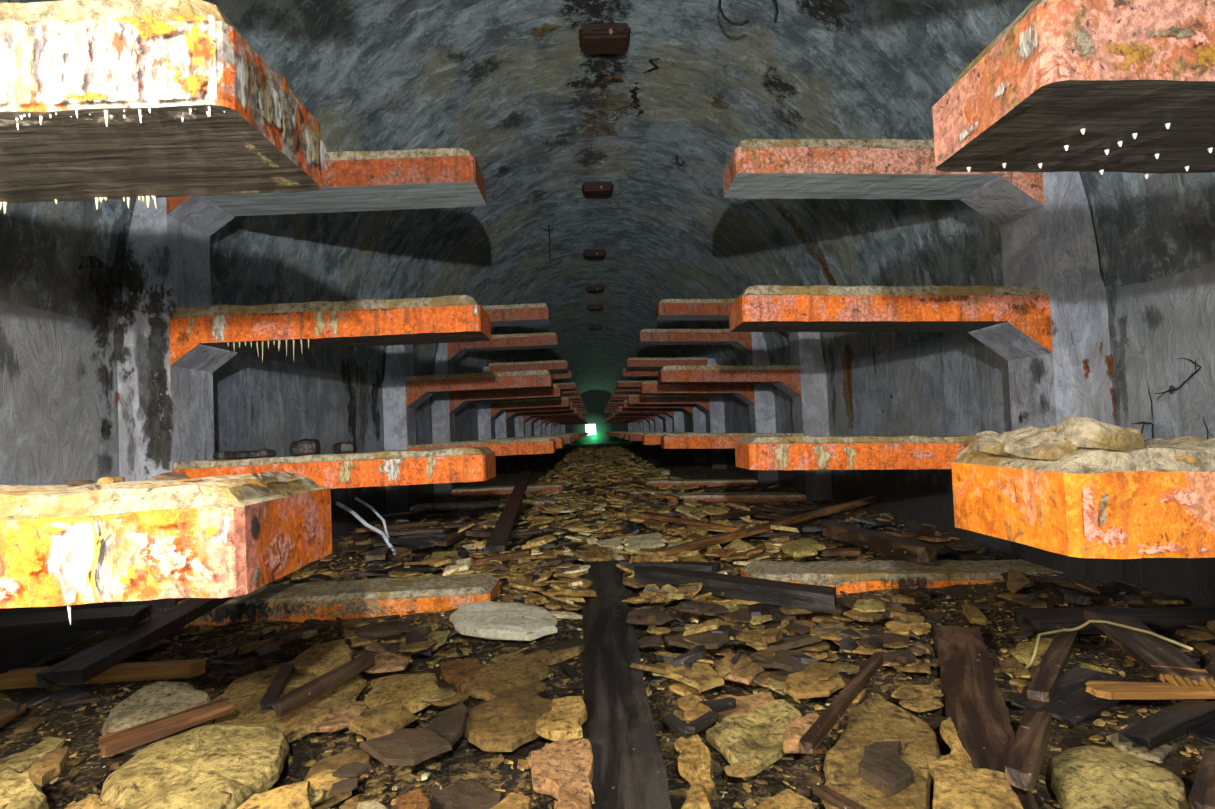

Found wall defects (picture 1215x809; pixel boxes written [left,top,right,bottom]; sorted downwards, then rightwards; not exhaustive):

corrosion [109,15,215,96]
corrosion [256,65,291,94]
corrosion [54,91,106,101]
water stain [212,315,227,342]
water stain [314,310,340,336]
corrosion [1004,303,1036,316]
water stain [0,332,19,378]
water stain [76,225,195,474]
crack [1131,358,1201,439]